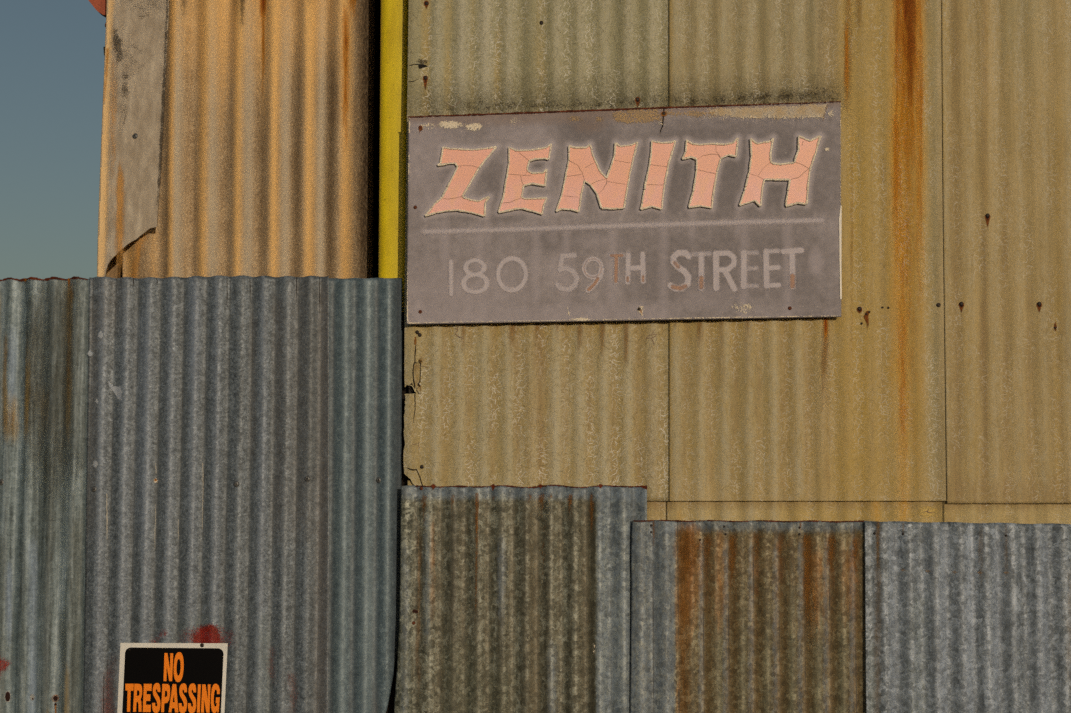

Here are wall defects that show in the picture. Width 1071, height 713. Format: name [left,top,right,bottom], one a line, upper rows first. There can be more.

rust [343,0,356,112]
rust [896,0,921,154]
rust [416,484,647,541]
rust [633,520,864,604]